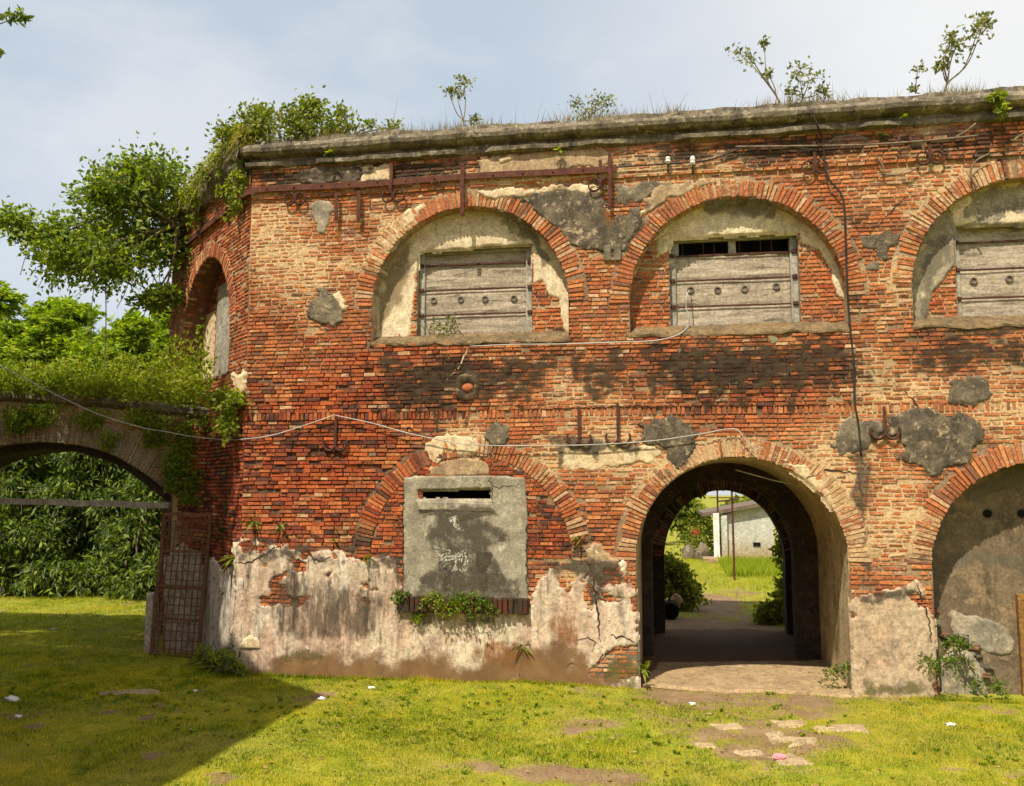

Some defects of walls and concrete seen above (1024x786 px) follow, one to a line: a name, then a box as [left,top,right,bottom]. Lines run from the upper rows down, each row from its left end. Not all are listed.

leakage [416,505,520,602]
flaking render [582,543,623,570]
crack [527,564,635,666]
flaking render [589,643,640,681]